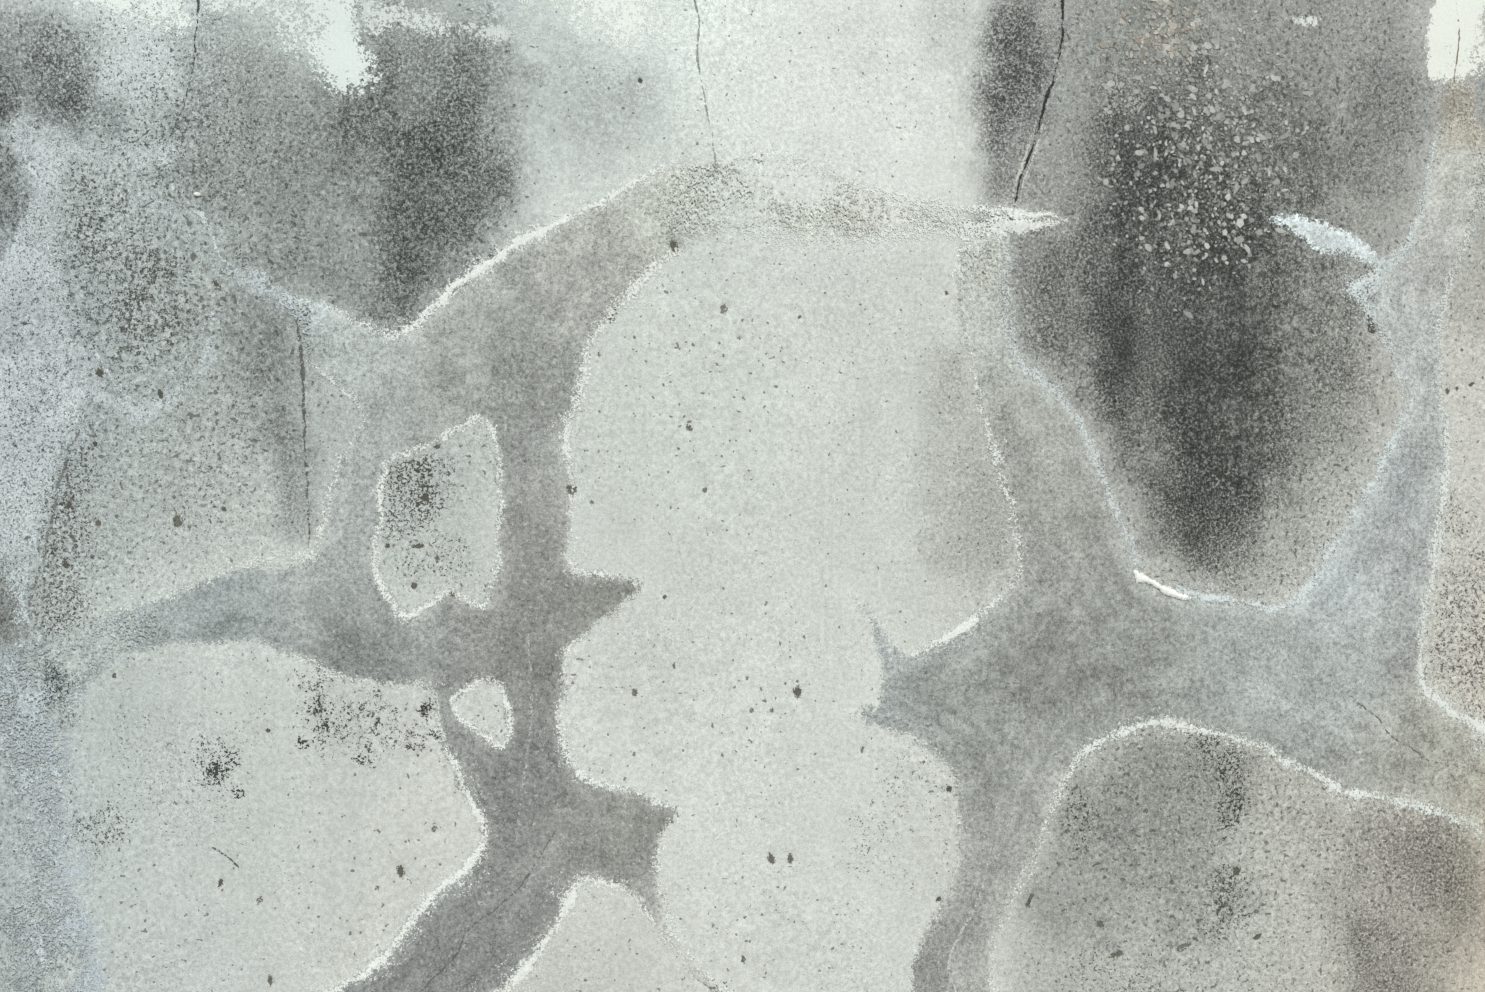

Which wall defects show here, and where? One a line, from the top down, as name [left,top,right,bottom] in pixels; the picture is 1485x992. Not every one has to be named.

damp [374,60,495,316]
crack [667,0,807,201]
damp [987,6,1045,197]
crack [968,0,1064,238]
damp [0,0,324,728]
damp [1087,86,1281,552]
crack [293,298,330,737]
damp [380,442,479,587]
damp [0,698,268,992]
damp [1038,938,1194,992]
damp [1186,728,1255,846]
damp [1197,864,1270,947]